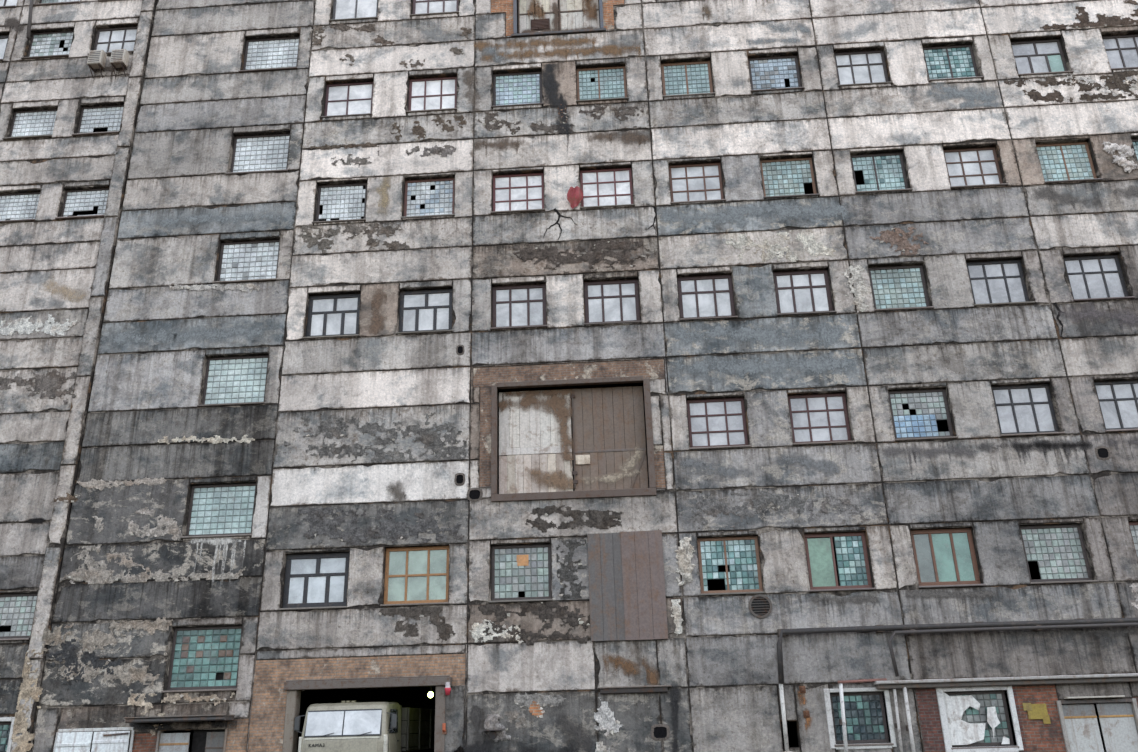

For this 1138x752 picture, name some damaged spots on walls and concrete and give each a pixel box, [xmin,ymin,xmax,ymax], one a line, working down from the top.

peeling [1040,0,1138,30]
peeling [1004,70,1138,103]
peeling [298,222,410,254]
crack [543,208,577,239]
peeling [284,412,483,502]
peeling [127,507,181,541]
peeling [63,516,245,584]
peeling [379,505,622,645]
rust [604,656,658,685]